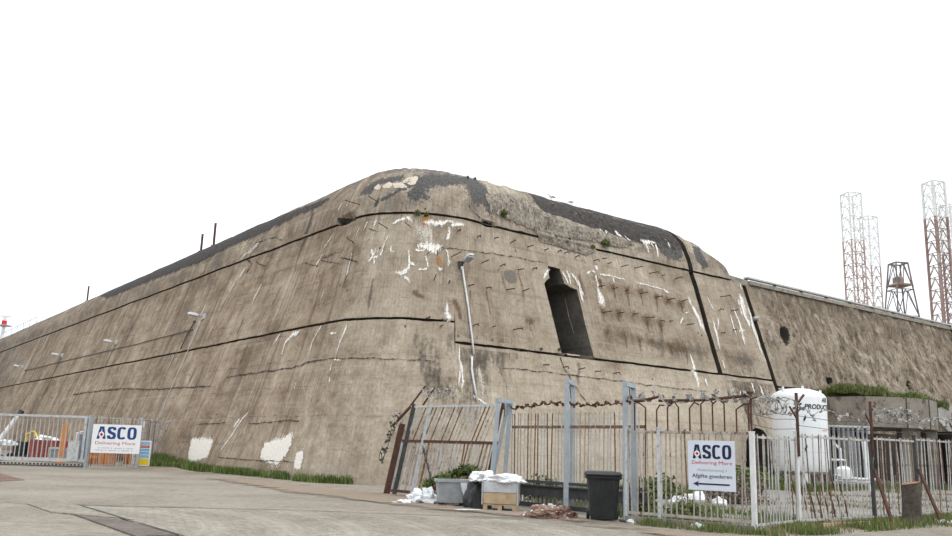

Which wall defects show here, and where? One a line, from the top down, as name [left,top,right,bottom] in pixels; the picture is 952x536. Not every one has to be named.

peeling [100,198,329,298]
leakage [393,216,464,283]
spalling [500,263,538,291]
spalling [345,172,709,279]
leakage [563,265,669,307]
leakage [680,284,762,353]